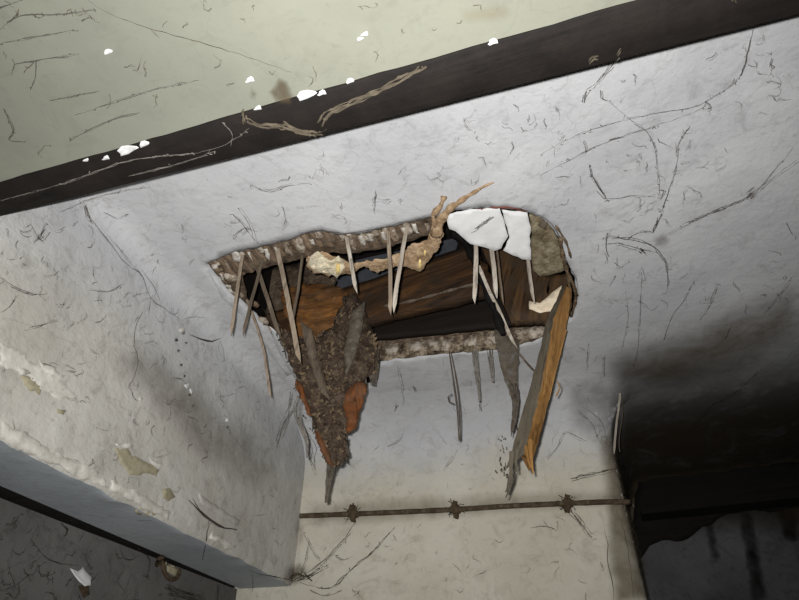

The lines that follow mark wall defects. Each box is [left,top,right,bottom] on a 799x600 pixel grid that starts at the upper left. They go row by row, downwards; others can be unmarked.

crack [89,1,289,72]
crack [84,203,225,389]
spalling [206,217,437,378]
peeling [447,206,579,317]
peeling [0,343,76,415]
spalling [377,326,545,361]
peeling [115,443,162,476]
peeling [162,488,175,501]
damp [606,441,642,597]